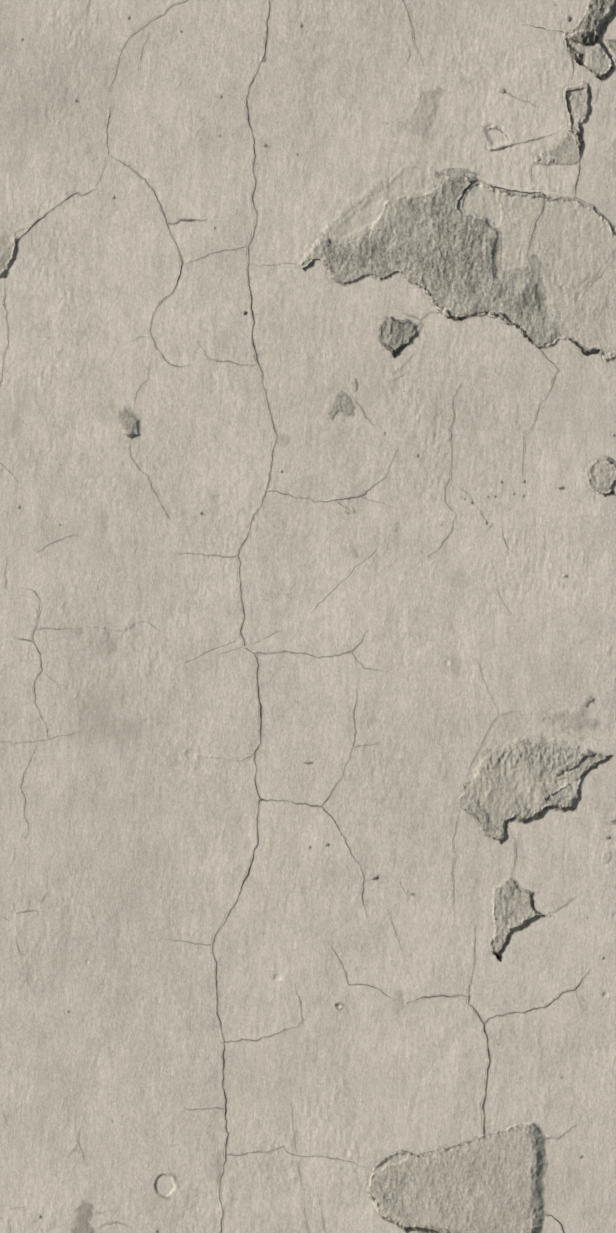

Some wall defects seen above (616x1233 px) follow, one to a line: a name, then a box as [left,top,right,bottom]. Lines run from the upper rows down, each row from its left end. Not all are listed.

spalling [530,0,616,168]
spalling [295,79,616,365]
crack [474,132,616,256]
crack [427,385,518,558]
crack [522,350,559,481]
spalling [582,454,616,498]
crack [0,0,408,1233]
spalling [455,693,614,847]
crack [326,808,590,1136]
spalling [487,873,553,962]
spalling [365,1117,555,1233]
crack [545,1213,565,1233]